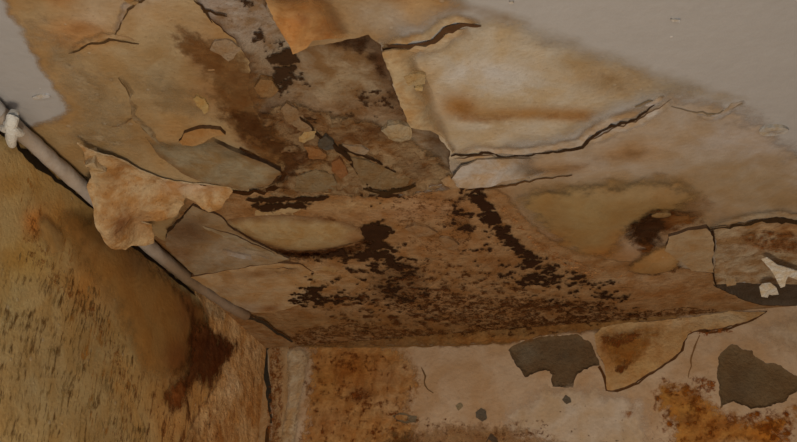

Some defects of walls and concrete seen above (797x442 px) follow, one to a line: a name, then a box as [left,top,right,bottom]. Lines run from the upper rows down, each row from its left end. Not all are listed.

crack [194,1,227,22]
damp [308,0,465,47]
crack [381,15,481,55]
damp [5,0,298,186]
spalling [197,0,460,189]
crack [451,96,743,163]
damp [268,20,797,341]
damp [0,135,222,442]
peeling [77,142,797,392]
corrosion [299,344,551,442]
corrosion [654,377,797,442]
spalling [717,344,797,409]